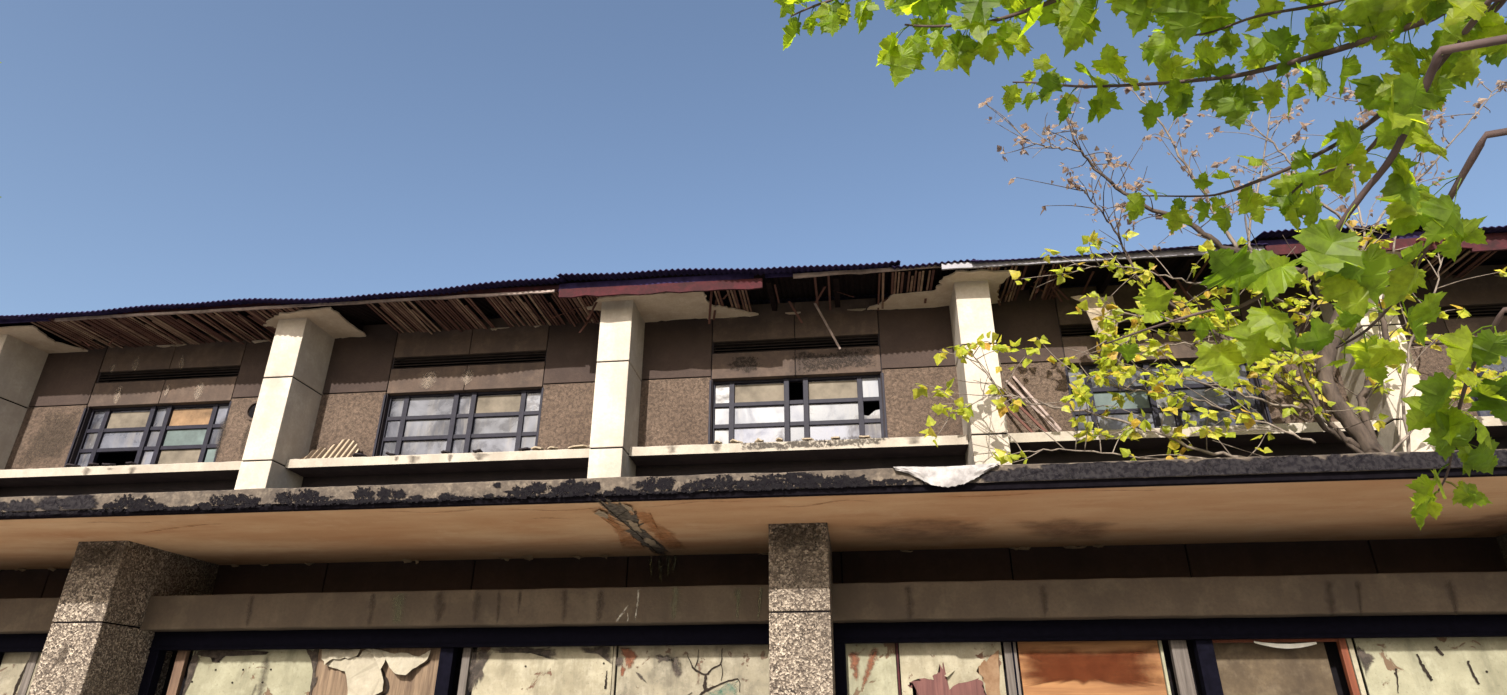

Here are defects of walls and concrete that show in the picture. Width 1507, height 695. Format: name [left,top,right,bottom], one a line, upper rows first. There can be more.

leakage [741,436,884,450]
leakage [977,451,1463,482]
leakage [1494,449,1507,466]
leakage [0,472,929,516]
spalling [594,496,668,556]